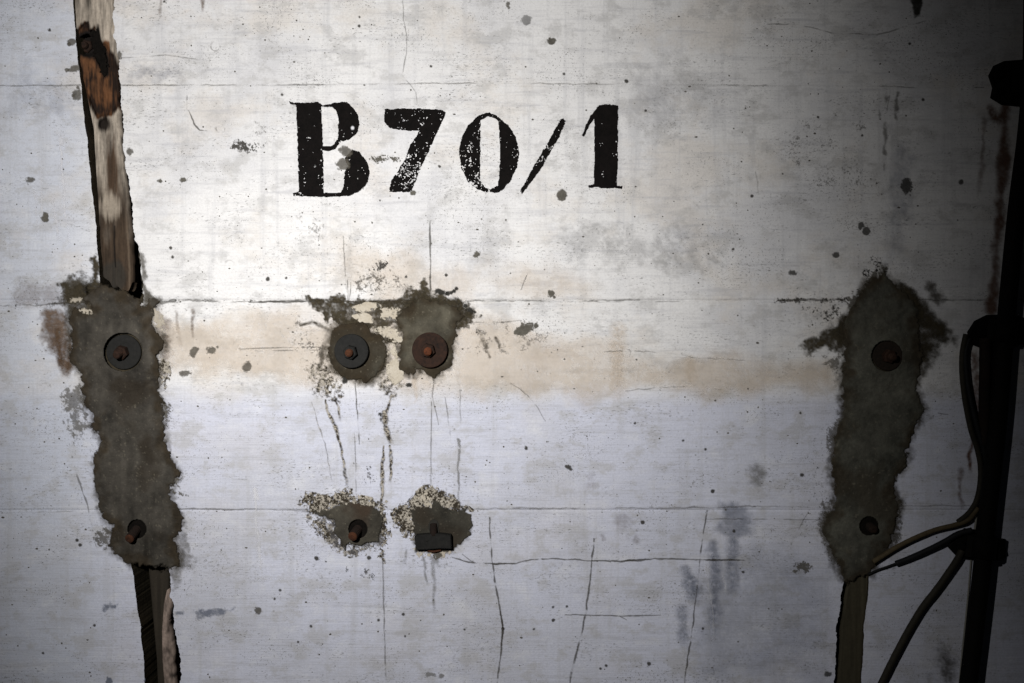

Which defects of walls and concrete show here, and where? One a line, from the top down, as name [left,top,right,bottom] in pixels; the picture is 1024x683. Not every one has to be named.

rust [42,310,72,372]
peeling [338,253,423,391]
peeling [435,265,477,333]
peeling [774,288,848,327]
spalling [295,463,478,580]
crack [456,515,734,680]